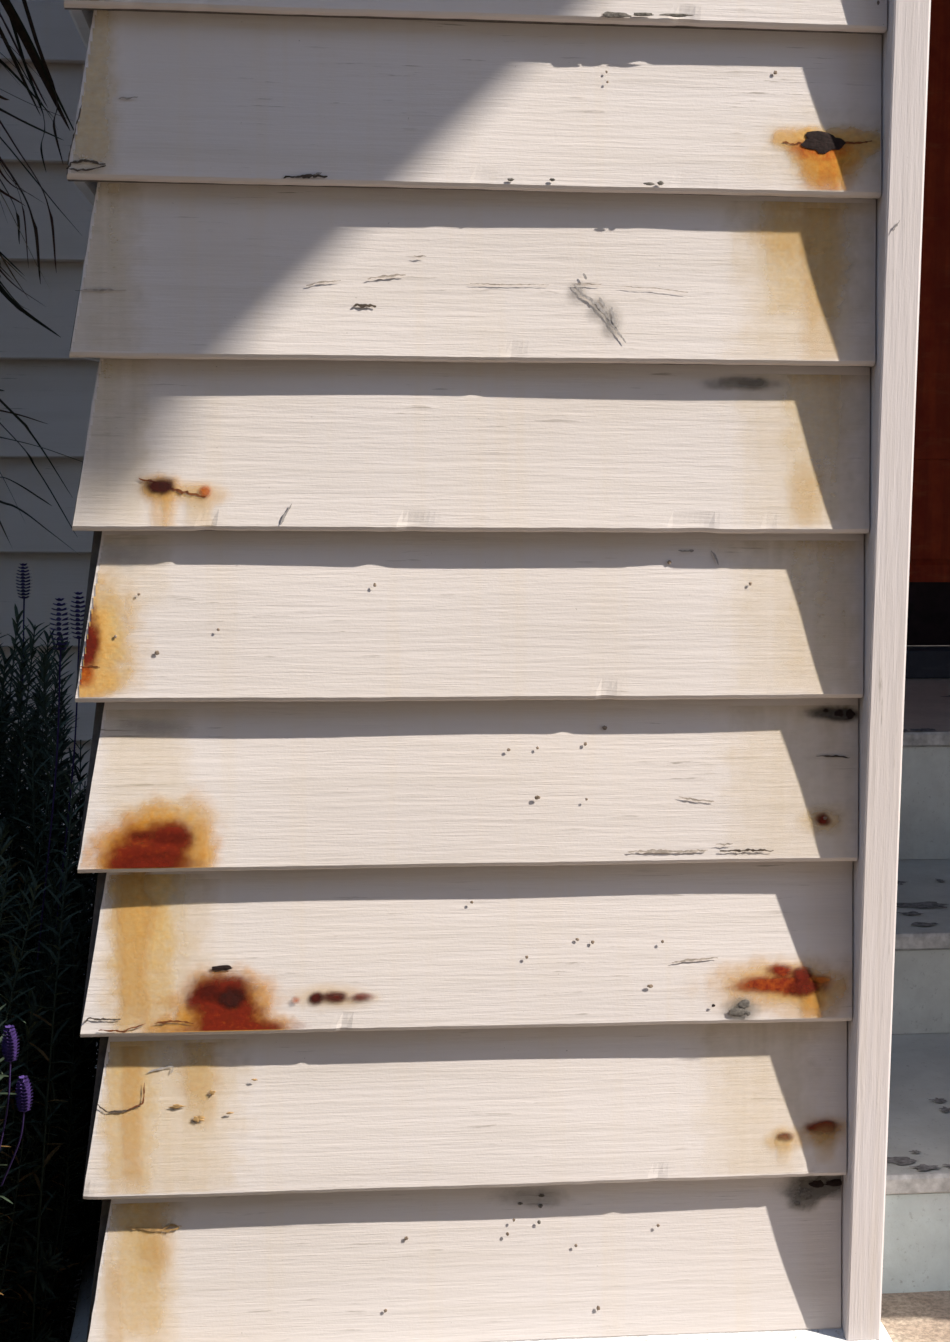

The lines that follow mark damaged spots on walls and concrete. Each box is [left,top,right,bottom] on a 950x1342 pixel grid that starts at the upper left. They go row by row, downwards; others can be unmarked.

corrosion [773,127,881,190]
corrosion [139,477,210,514]
corrosion [79,580,131,697]
corrosion [95,803,215,869]
corrosion [155,973,285,1033]
corrosion [293,992,371,1003]
corrosion [730,965,846,1014]
corrosion [775,1133,792,1144]
corrosion [807,1121,839,1139]